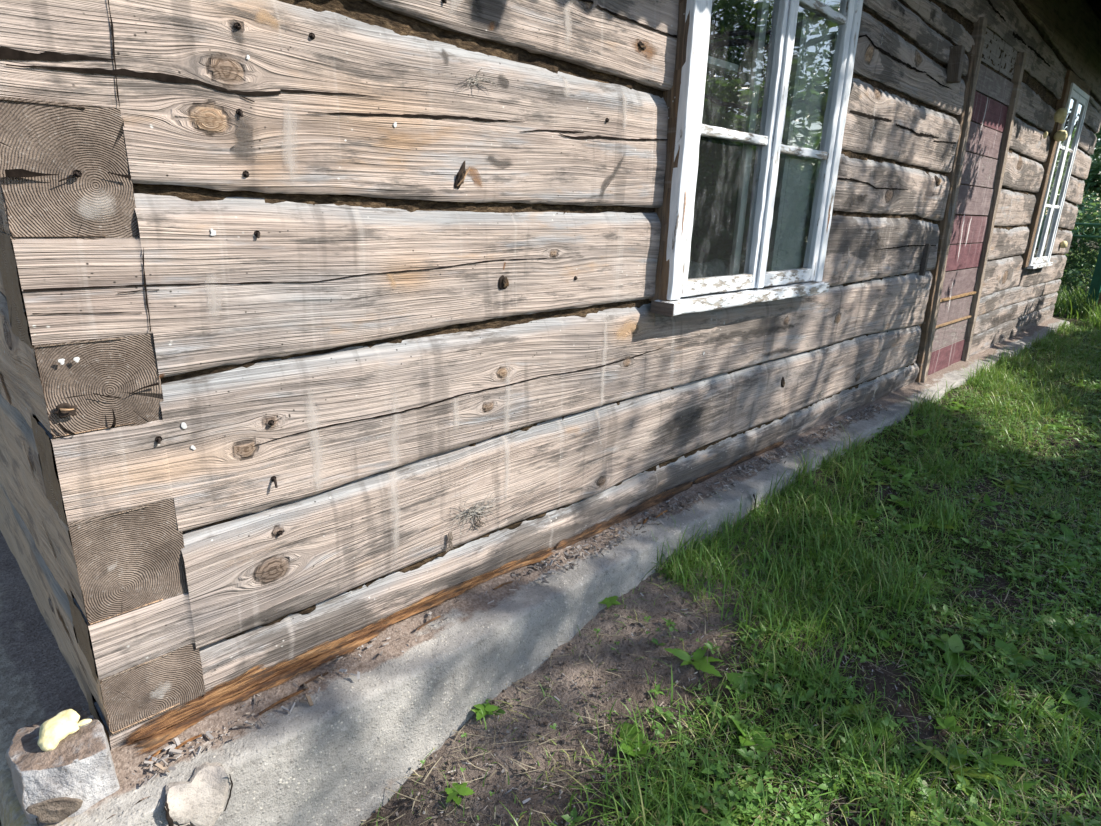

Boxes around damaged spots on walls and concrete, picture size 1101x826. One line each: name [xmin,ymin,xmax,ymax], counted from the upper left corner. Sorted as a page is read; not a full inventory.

crack [0,47,668,141]
crack [164,796,192,826]
peeling [164,762,231,826]
crack [224,774,233,811]